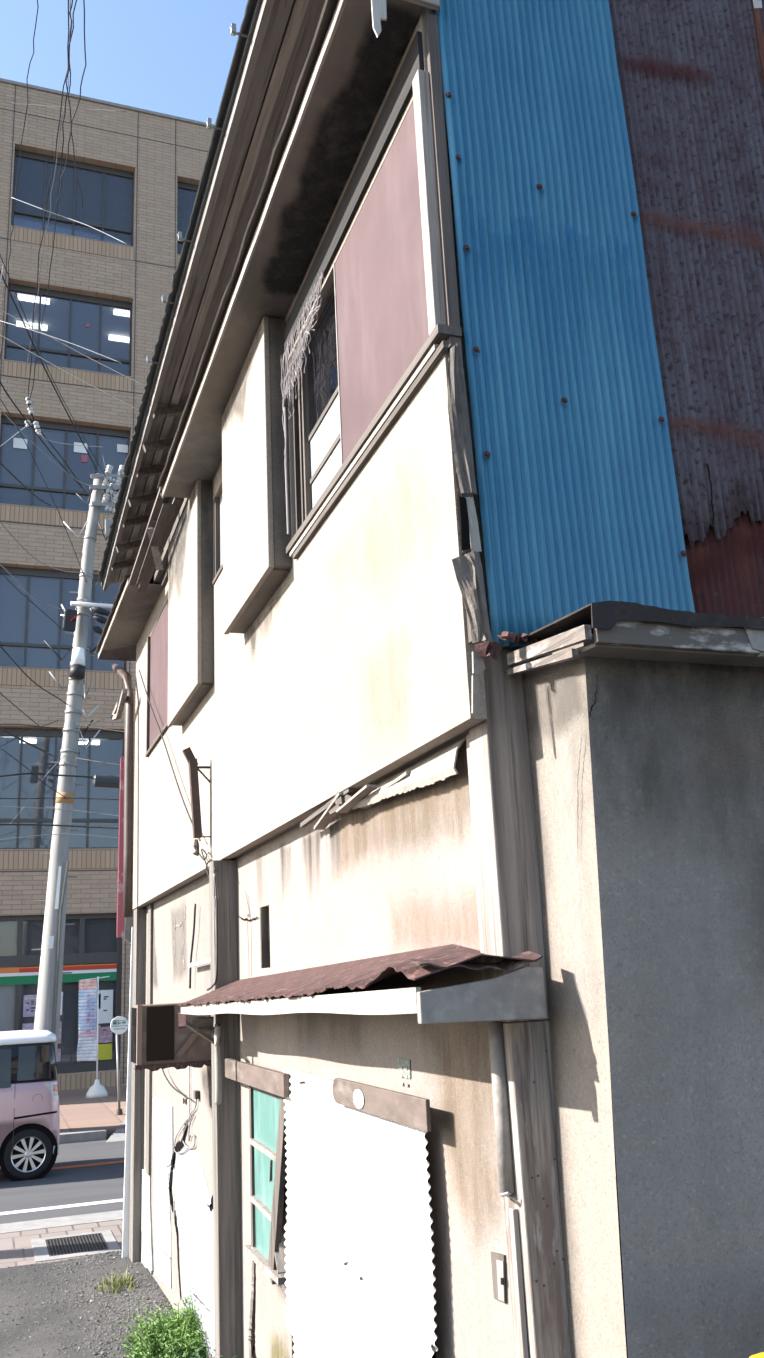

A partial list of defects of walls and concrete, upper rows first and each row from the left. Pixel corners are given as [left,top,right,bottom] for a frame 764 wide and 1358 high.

peeling [448,342,502,714]
corrosion [684,510,764,617]
corrosion [178,944,542,1006]
peeling [168,1149,215,1358]
crack [247,1261,255,1358]